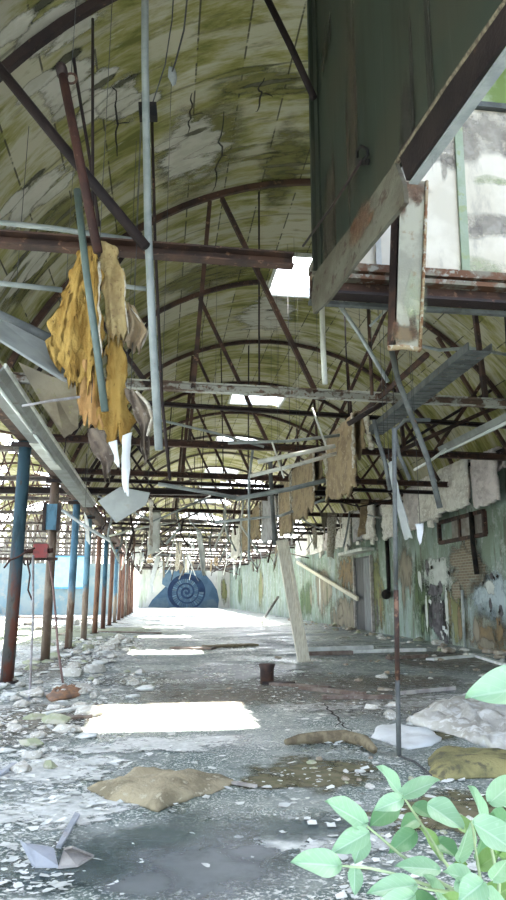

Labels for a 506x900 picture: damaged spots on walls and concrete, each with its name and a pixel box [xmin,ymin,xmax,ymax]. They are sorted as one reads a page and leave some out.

peeling [0,0,85,51]
peeling [16,13,161,128]
crack [112,87,130,156]
peeling [154,114,234,180]
crack [187,93,229,190]
crack [256,78,273,112]
damp [300,570,354,628]
flaking render [418,540,506,644]
crack [322,701,352,731]